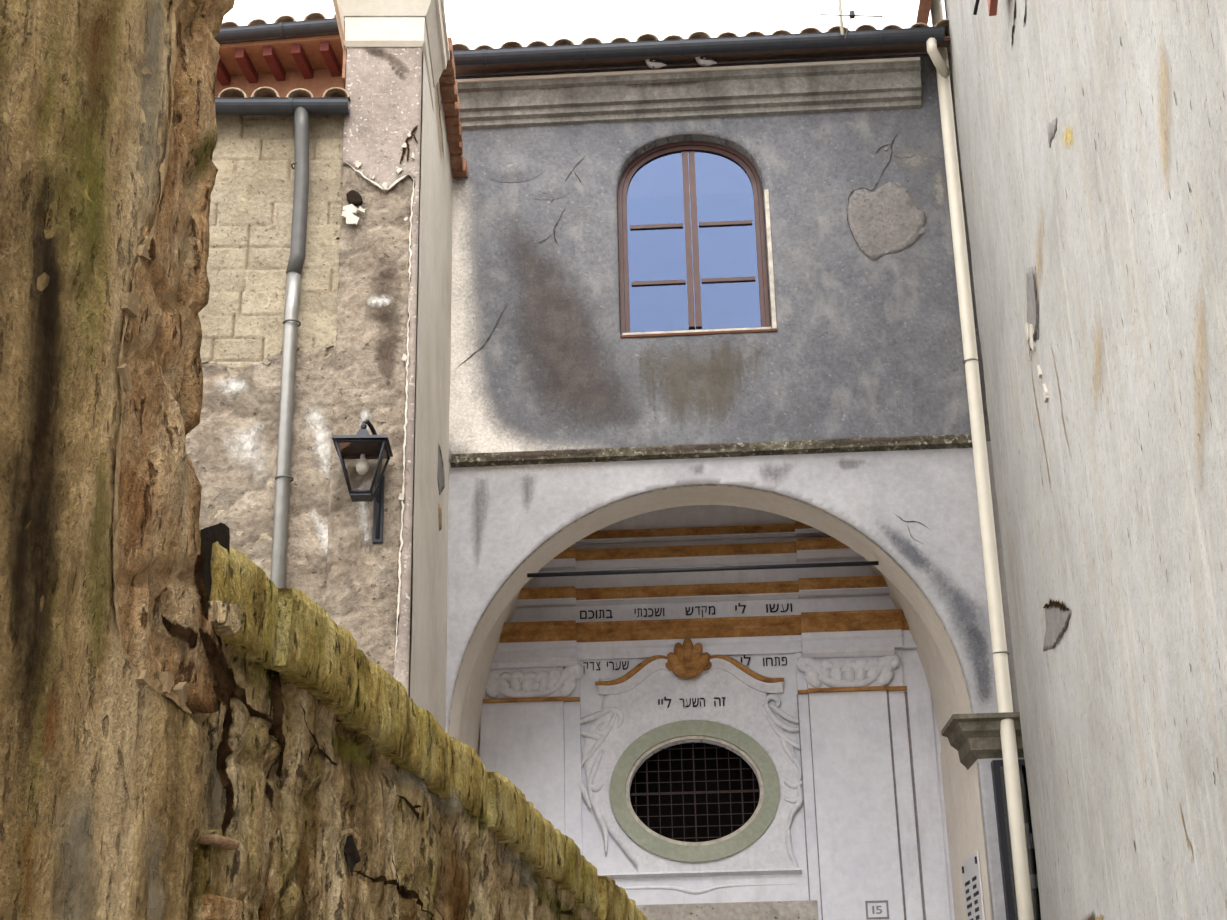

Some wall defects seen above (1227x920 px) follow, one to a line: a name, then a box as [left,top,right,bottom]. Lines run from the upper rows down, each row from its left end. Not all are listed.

flaking render [847,147,945,261]
water stain [519,244,625,419]
water stain [646,347,741,416]
water stain [891,534,925,565]
water stain [937,574,989,694]
flaking render [1043,599,1072,651]
crack [161,553,337,836]
crack [353,855,434,920]